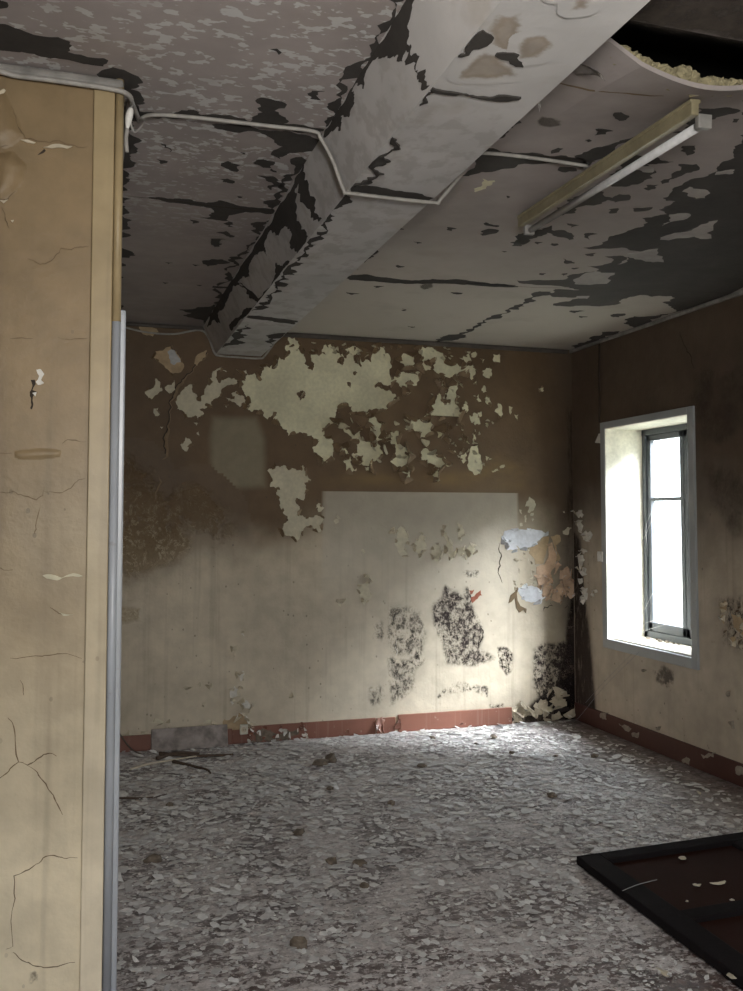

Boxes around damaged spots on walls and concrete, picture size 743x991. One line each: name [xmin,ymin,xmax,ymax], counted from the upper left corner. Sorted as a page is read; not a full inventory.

crack [0,478,85,534]
crack [13,653,82,695]
peeling [267,463,324,542]
mould [371,586,512,704]
peeling [501,497,598,613]
leakage [515,489,595,723]
crack [0,718,63,815]
peeling [117,630,743,991]
crack [8,855,75,968]